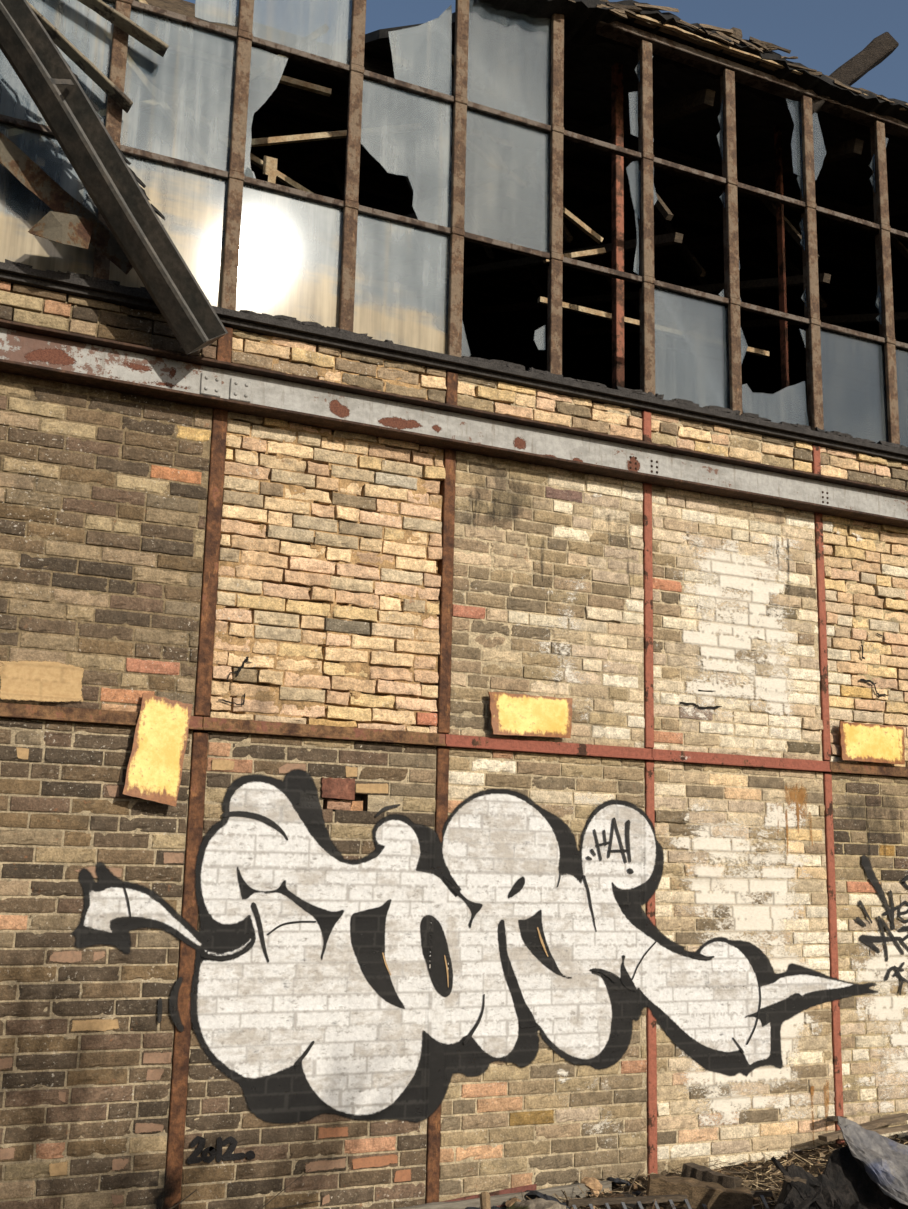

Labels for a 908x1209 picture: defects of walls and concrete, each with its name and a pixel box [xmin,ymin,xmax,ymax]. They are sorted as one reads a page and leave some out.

crack [218,656,253,705]
crack [680,689,722,710]
crack [860,633,889,700]
corrosion [778,784,813,854]